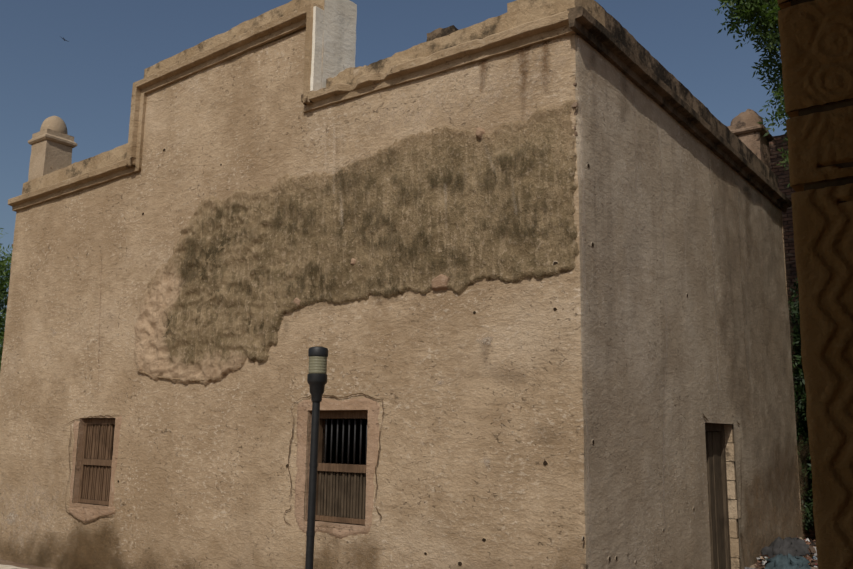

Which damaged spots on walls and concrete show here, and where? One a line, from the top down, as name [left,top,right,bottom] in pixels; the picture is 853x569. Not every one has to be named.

crack [283,393,384,524]